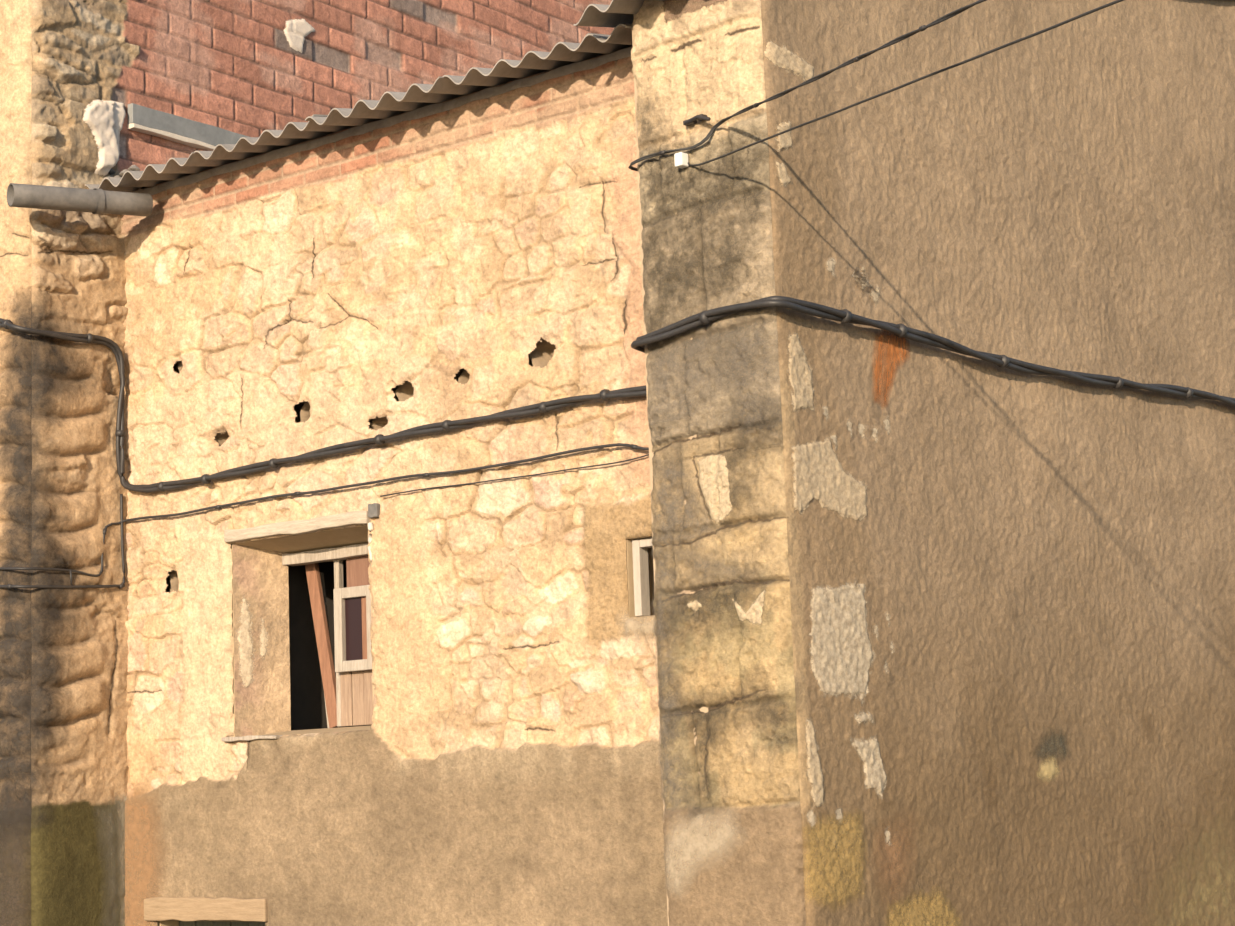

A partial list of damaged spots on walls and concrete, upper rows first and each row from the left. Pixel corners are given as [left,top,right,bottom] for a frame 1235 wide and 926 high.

crack [264,240,378,348]
crack [580,181,627,334]
leakage [644,228,747,330]
leakage [651,326,777,450]
corrosion [874,331,907,404]
spalling [698,454,733,526]
peeling [791,419,890,521]
leakage [0,305,83,926]
crack [506,641,559,650]
leakage [626,461,708,806]
peeling [809,583,894,723]
peeling [850,738,887,796]